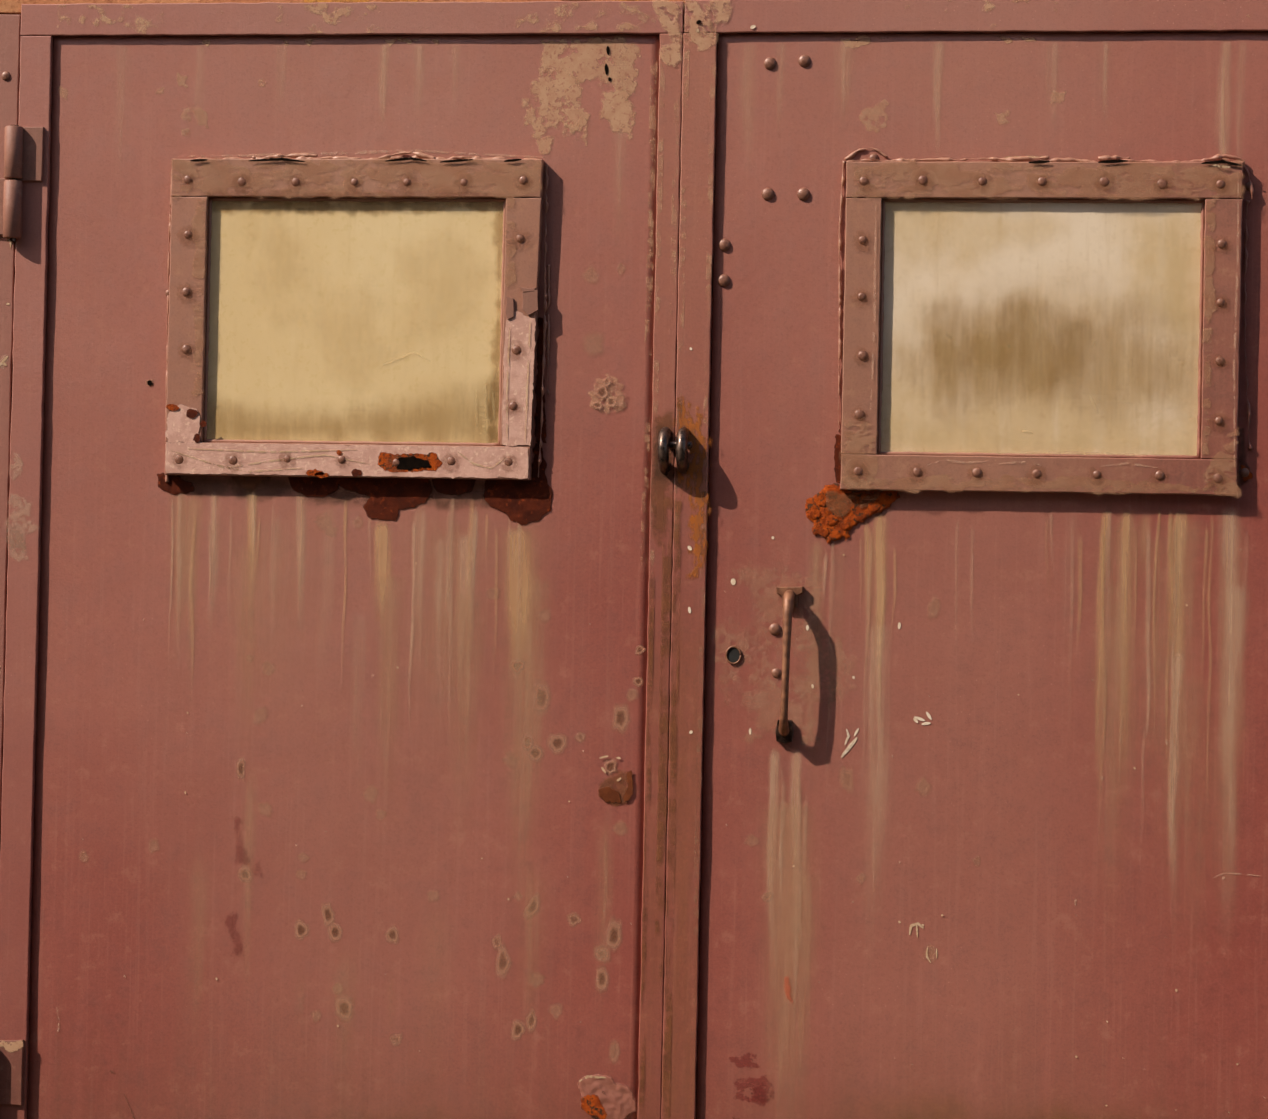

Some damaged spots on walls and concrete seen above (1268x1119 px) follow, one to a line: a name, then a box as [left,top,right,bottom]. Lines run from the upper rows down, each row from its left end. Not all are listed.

peeling [147,0,731,482]
corrosion [166,404,207,443]
corrosion [288,317,553,525]
corrosion [157,473,194,495]
corrosion [232,476,269,490]
corrosion [805,434,900,544]
corrosion [642,398,710,924]
corrosion [598,772,628,805]
peeling [578,1074,636,1119]